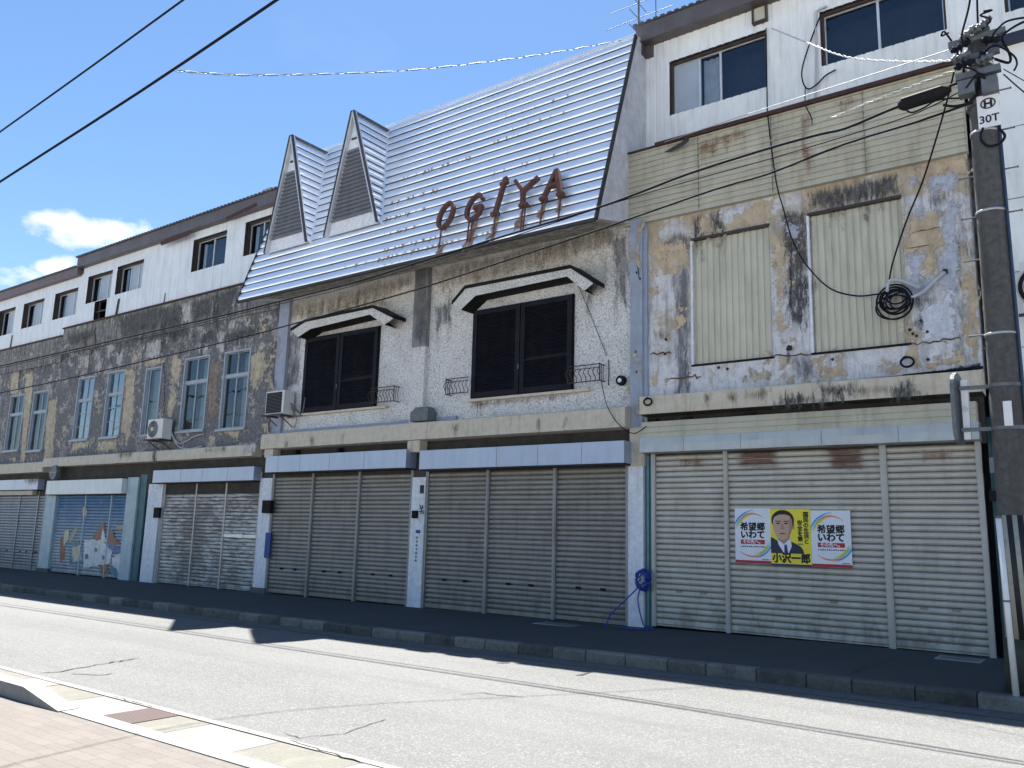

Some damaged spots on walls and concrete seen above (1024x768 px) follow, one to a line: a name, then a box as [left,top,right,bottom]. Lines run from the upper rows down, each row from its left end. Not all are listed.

peeling [9,370,34,463]
peeling [44,339,183,458]
damp [119,289,260,366]
peeling [195,320,281,447]
damp [261,222,626,340]
peeling [629,196,802,385]
rust [741,451,775,465]
damp [773,384,861,408]
damp [783,175,899,329]
peeling [876,156,985,375]